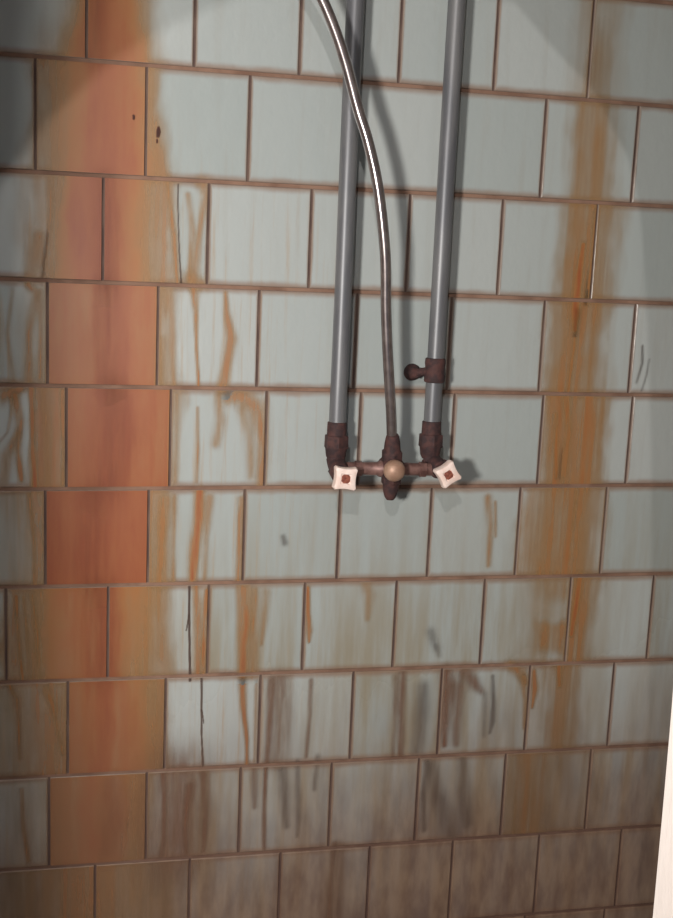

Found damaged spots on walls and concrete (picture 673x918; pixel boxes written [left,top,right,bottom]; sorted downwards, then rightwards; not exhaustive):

rust [1,0,207,918]
rust [189,490,211,674]
rust [218,292,264,486]
rust [236,498,263,765]
rust [263,679,282,849]
rust [529,129,603,749]